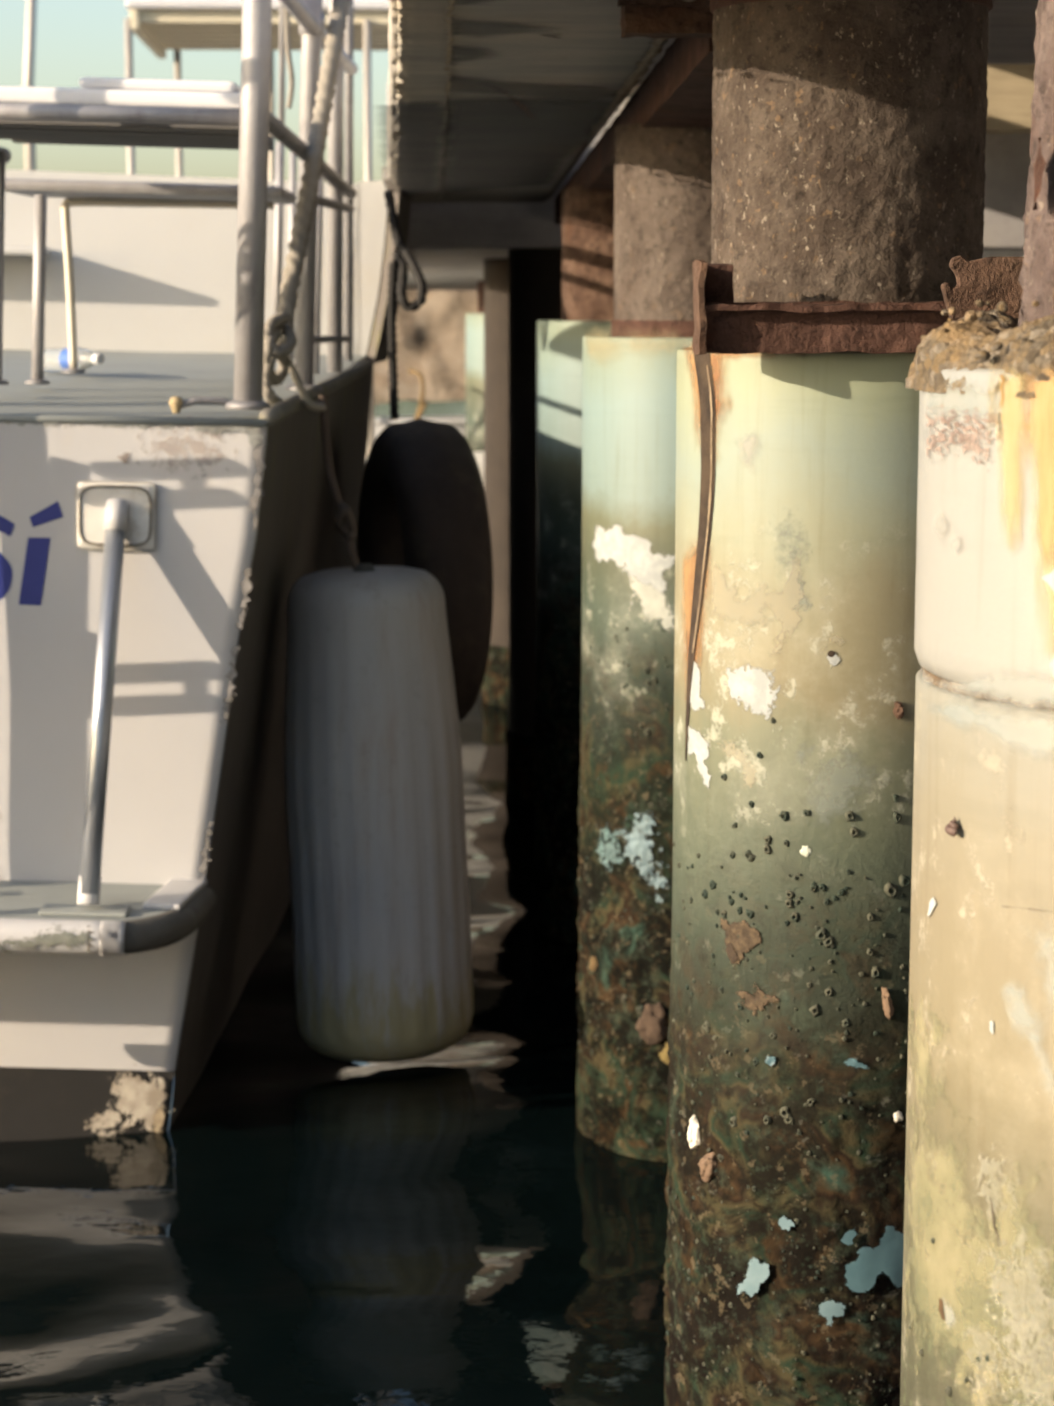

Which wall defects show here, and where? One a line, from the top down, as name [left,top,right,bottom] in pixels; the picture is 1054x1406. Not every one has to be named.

rust [689,352,776,426]
spalling [905,300,1054,464]
rust [1001,372,1054,639]
peeling [593,524,675,631]
rust [684,548,707,660]
peeling [688,661,755,788]
peeling [724,664,781,720]
peeling [595,813,669,902]
peeling [736,1257,769,1297]
peeling [818,1226,904,1327]